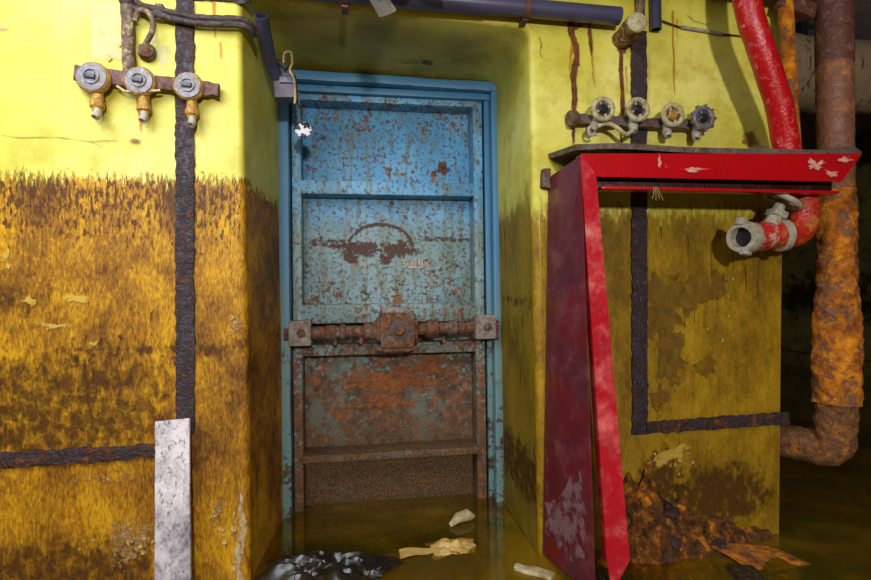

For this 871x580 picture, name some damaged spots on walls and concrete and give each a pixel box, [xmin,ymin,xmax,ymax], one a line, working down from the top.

corrosion [564,21,595,110]
crack [2,135,116,149]
water stain [0,169,176,452]
water stain [191,172,283,580]
water stain [599,203,780,546]
water stain [647,208,817,422]
water stain [859,272,871,321]
water stain [0,457,155,580]
water stain [587,336,607,580]
water stain [622,563,634,580]
peeling [648,443,694,476]